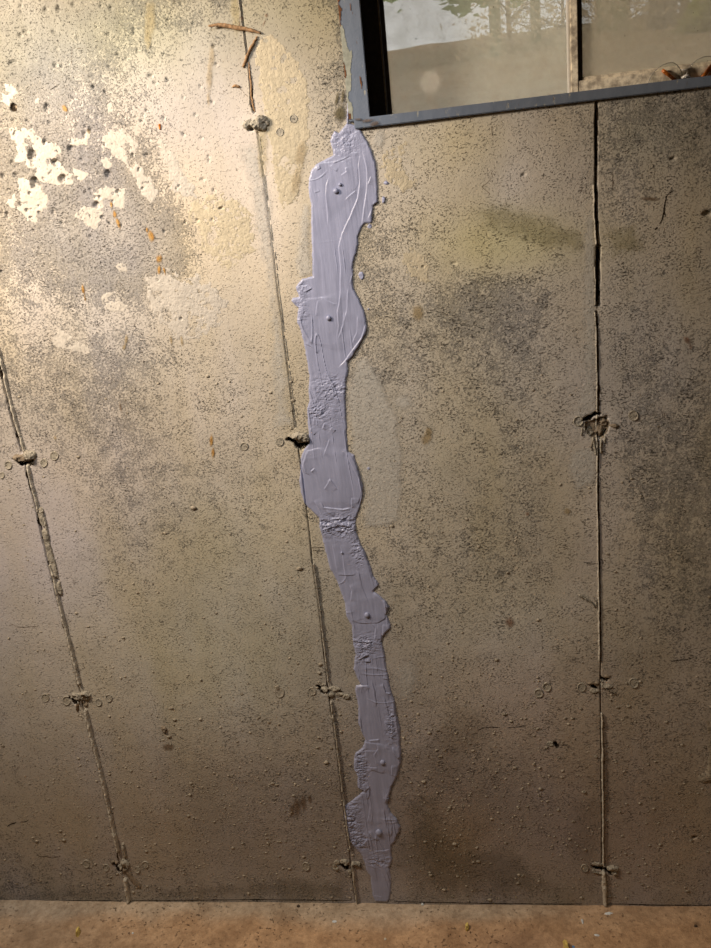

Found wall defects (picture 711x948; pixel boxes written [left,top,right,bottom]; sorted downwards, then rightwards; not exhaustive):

peeling [0,83,18,111]
peeling [5,119,258,272]